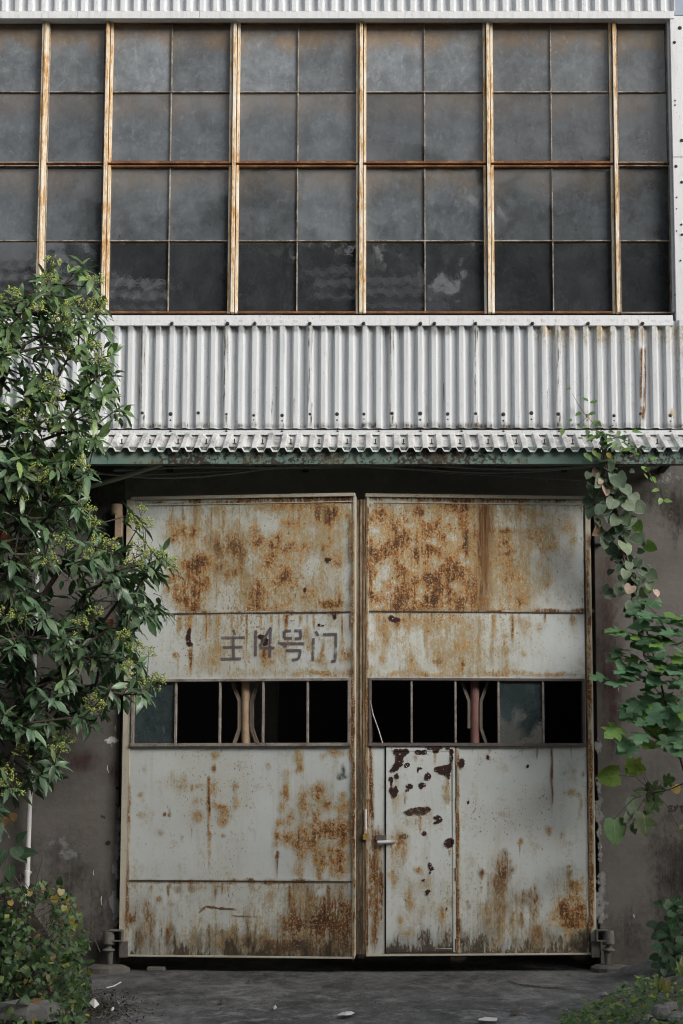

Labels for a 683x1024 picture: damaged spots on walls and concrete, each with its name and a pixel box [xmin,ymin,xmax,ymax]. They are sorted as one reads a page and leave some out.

rust [125,493,594,959]
peeling [389,746,465,798]
peeling [403,806,443,836]